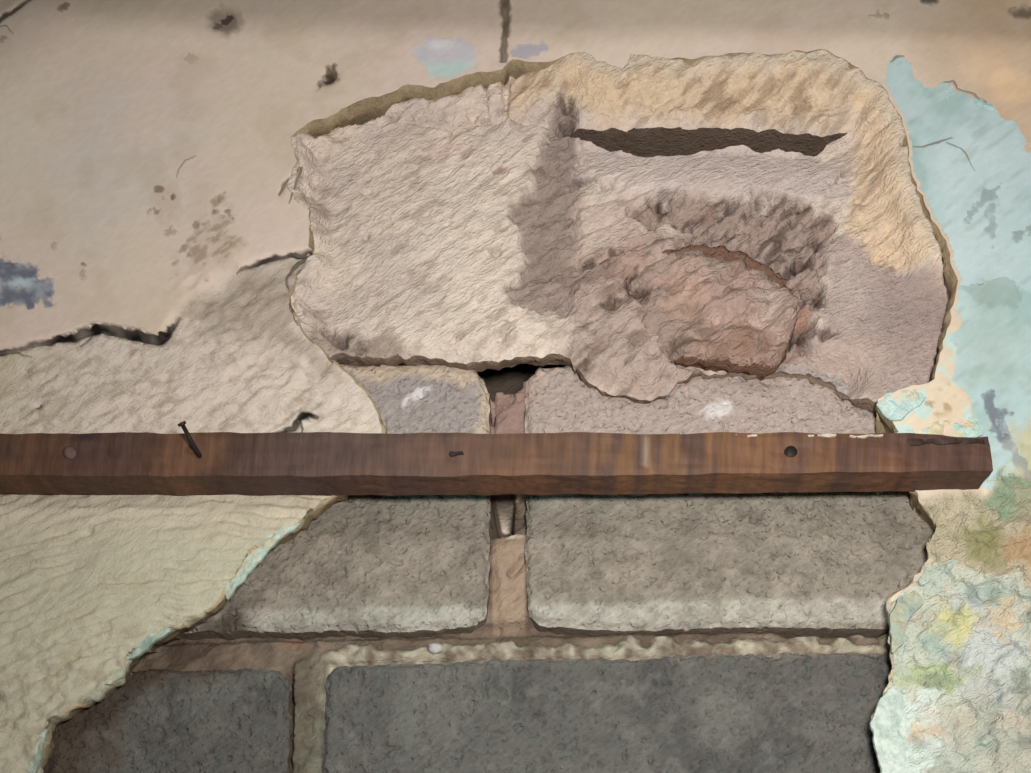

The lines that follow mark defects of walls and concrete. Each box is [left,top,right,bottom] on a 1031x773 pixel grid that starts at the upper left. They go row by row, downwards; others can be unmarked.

crack [0,0,30,34]
peeling [0,236,57,310]
flaking render [287,33,1031,491]
crack [0,315,182,358]
flaking render [26,491,1031,773]